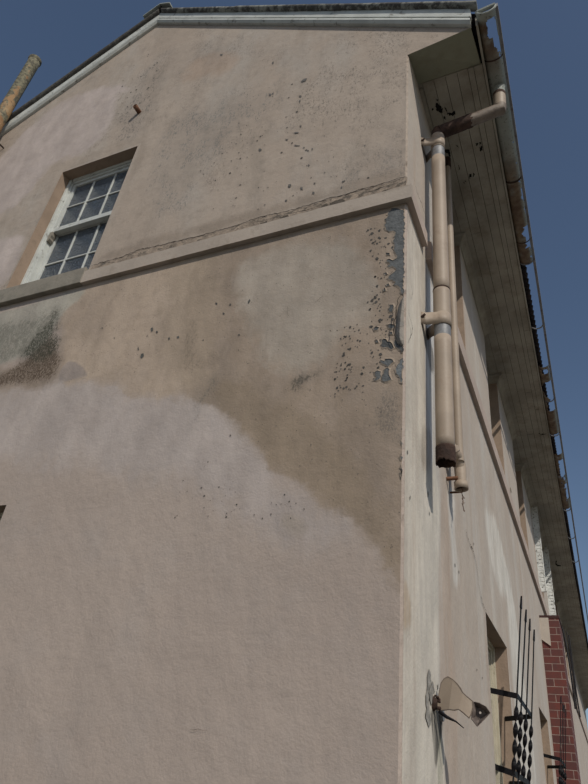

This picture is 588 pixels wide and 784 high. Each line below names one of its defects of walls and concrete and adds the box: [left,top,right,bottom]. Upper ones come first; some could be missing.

spalling [90,177,407,270]
crack [94,176,406,265]
peeling [330,208,405,400]
damp [0,204,412,639]